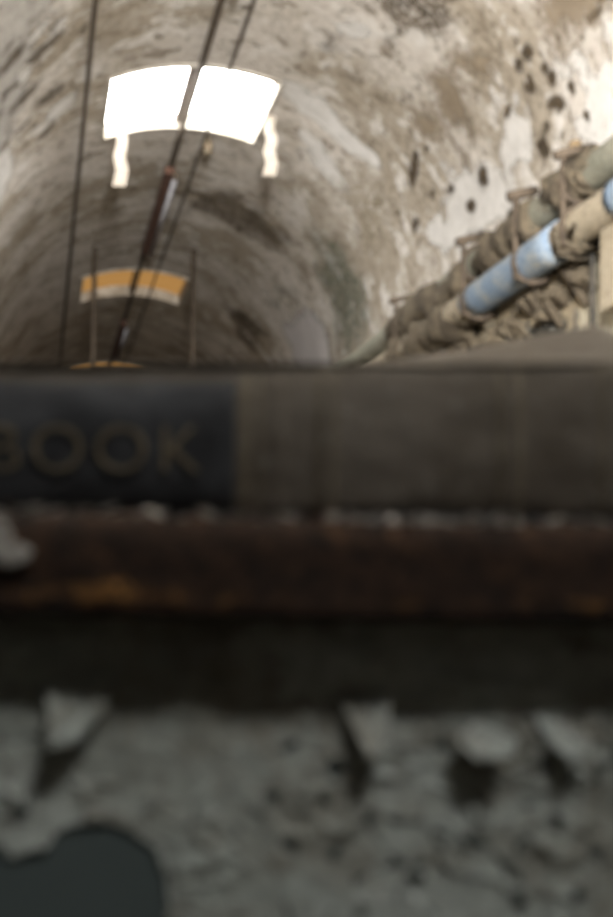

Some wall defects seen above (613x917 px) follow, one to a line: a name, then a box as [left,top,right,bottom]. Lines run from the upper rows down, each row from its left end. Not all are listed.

peeling [281,80,380,194]
peeling [397,0,613,256]
spalling [447,259,598,352]